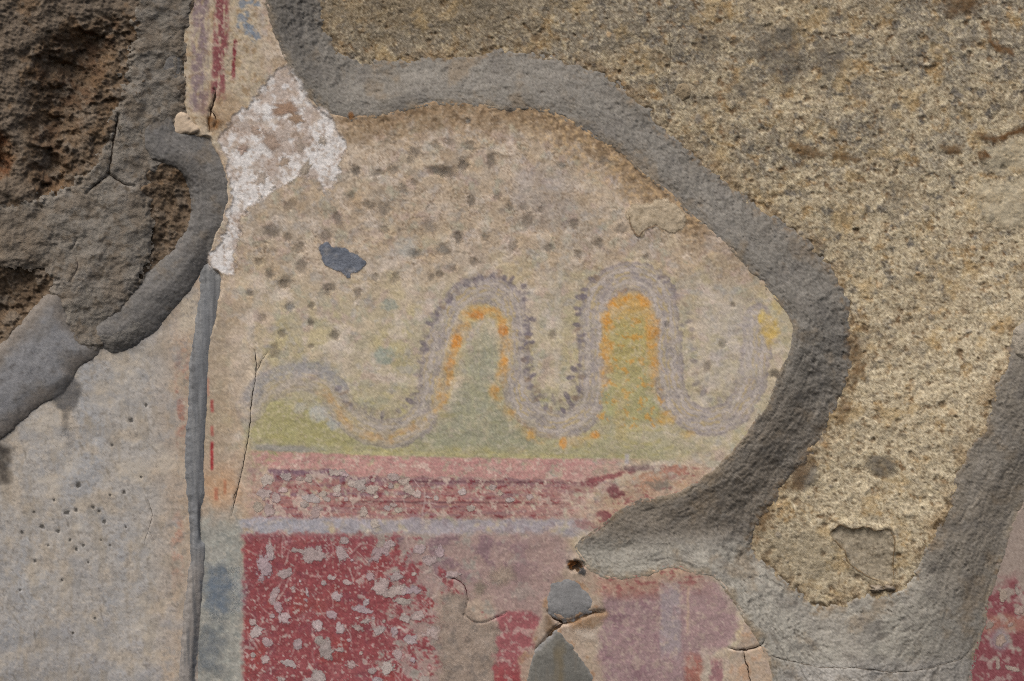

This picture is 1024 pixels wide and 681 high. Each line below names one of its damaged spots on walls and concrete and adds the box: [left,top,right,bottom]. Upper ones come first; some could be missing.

flaking render [174,112,200,135]
crack [87,117,131,193]
flaking render [625,198,686,237]
crack [232,353,267,512]
peeling [253,469,439,528]
flaking render [830,524,895,583]
peeling [249,536,444,681]
crack [543,611,602,642]